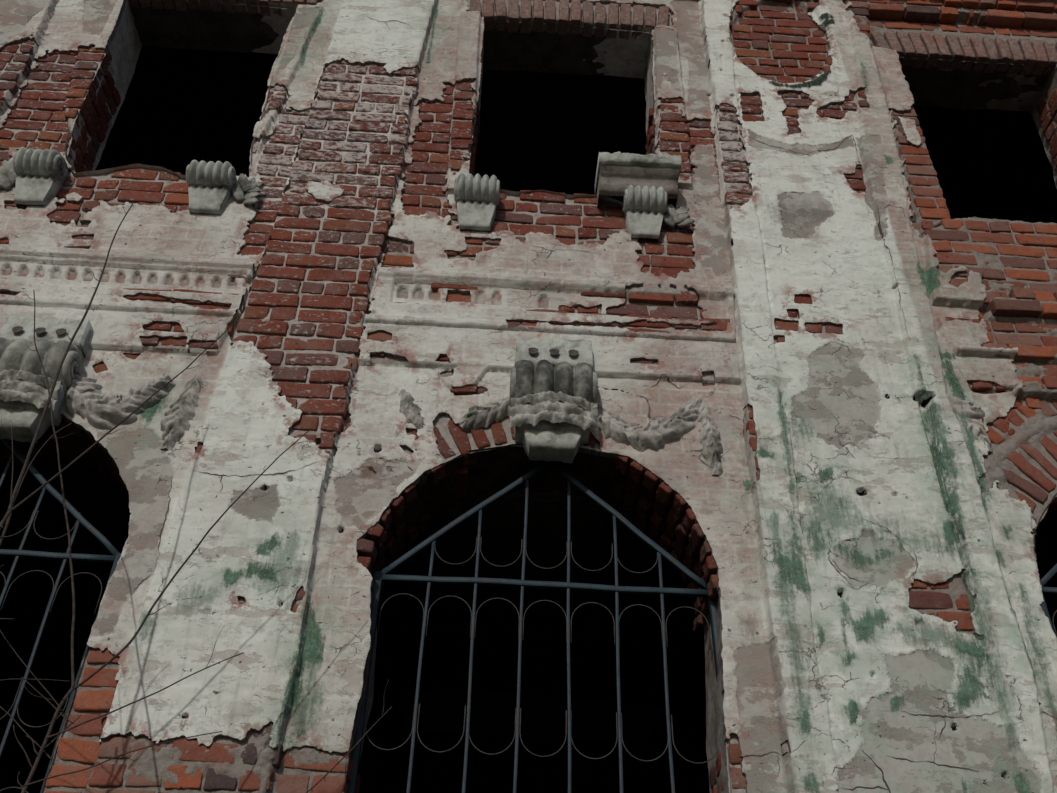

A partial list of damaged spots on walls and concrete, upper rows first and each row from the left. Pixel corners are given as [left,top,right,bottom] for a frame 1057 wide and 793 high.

flaking render [843,0,1057,48]
spalling [0,0,189,249]
spalling [123,0,889,457]
flaking render [888,103,1057,432]
spalling [92,361,108,373]
spalling [743,403,760,485]
spalling [43,421,351,793]
peeling [833,529,984,641]
crack [844,711,998,793]